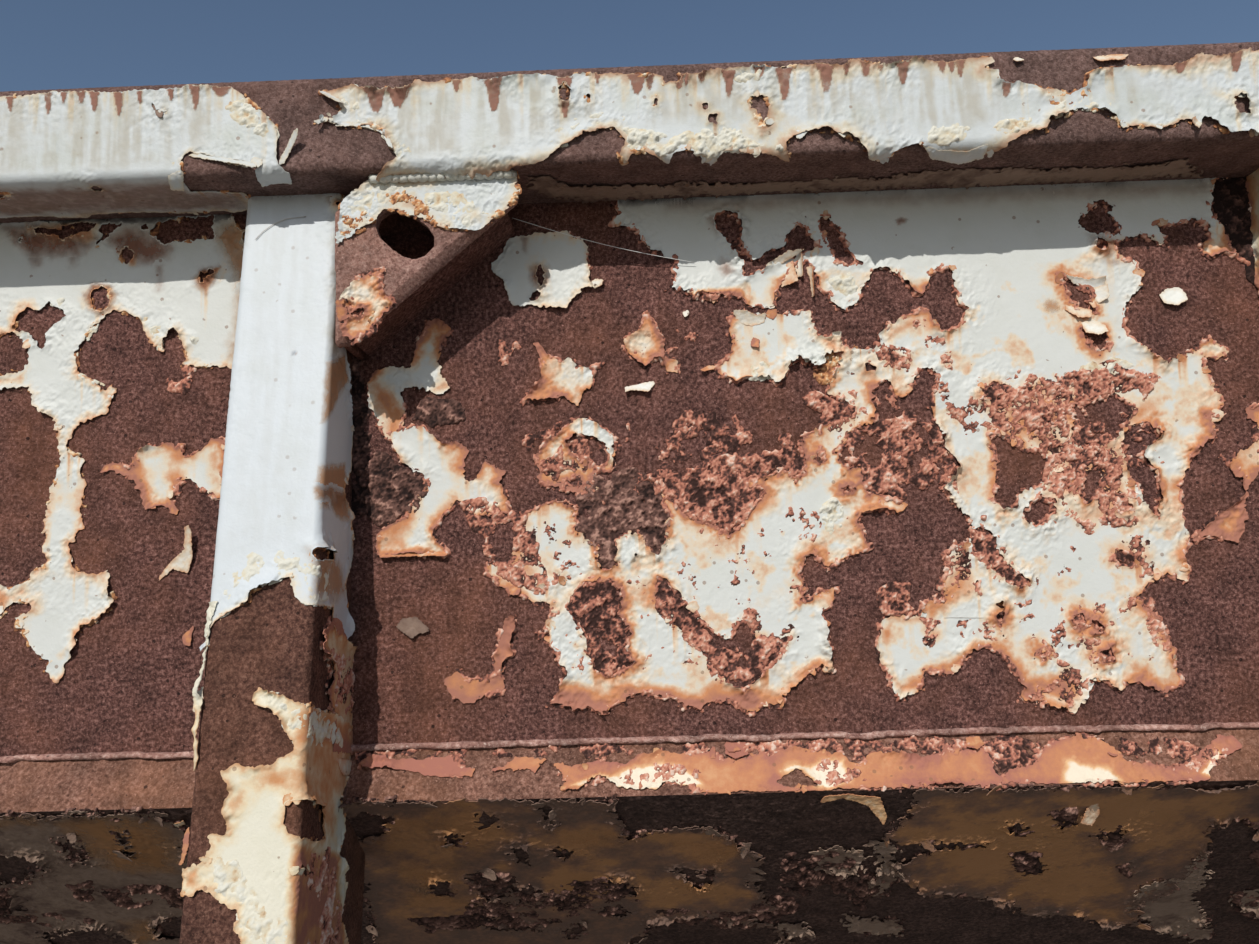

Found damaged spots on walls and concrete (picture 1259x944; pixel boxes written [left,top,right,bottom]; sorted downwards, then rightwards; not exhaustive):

peeling [313,47,1259,182]
rust [318,560,342,594]
peeling [0,84,816,944]
peeling [483,159,1259,717]
rust [66,819,168,868]
peeling [554,732,1259,943]